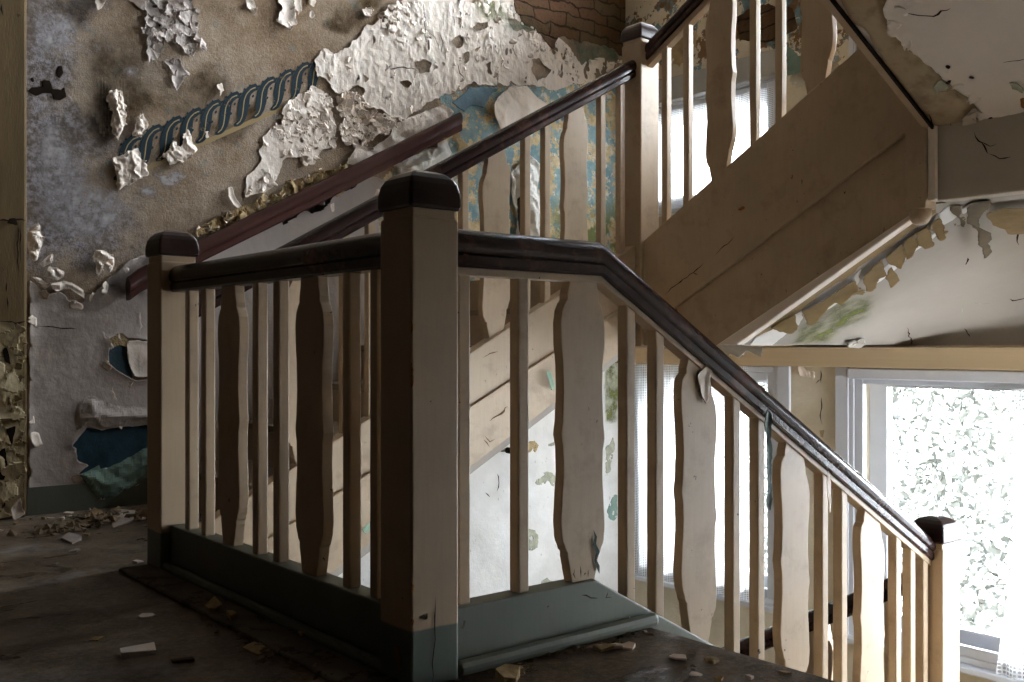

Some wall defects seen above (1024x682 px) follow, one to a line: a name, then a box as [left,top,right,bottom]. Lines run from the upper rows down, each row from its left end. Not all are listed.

peeling [129,0,207,91]
peeling [192,0,626,240]
crack [974,133,1009,159]
peeling [202,177,384,262]
peeling [0,223,149,520]
peeling [244,288,253,419]
peeling [328,276,339,380]
mould [796,303,868,342]
peeling [719,201,1024,358]